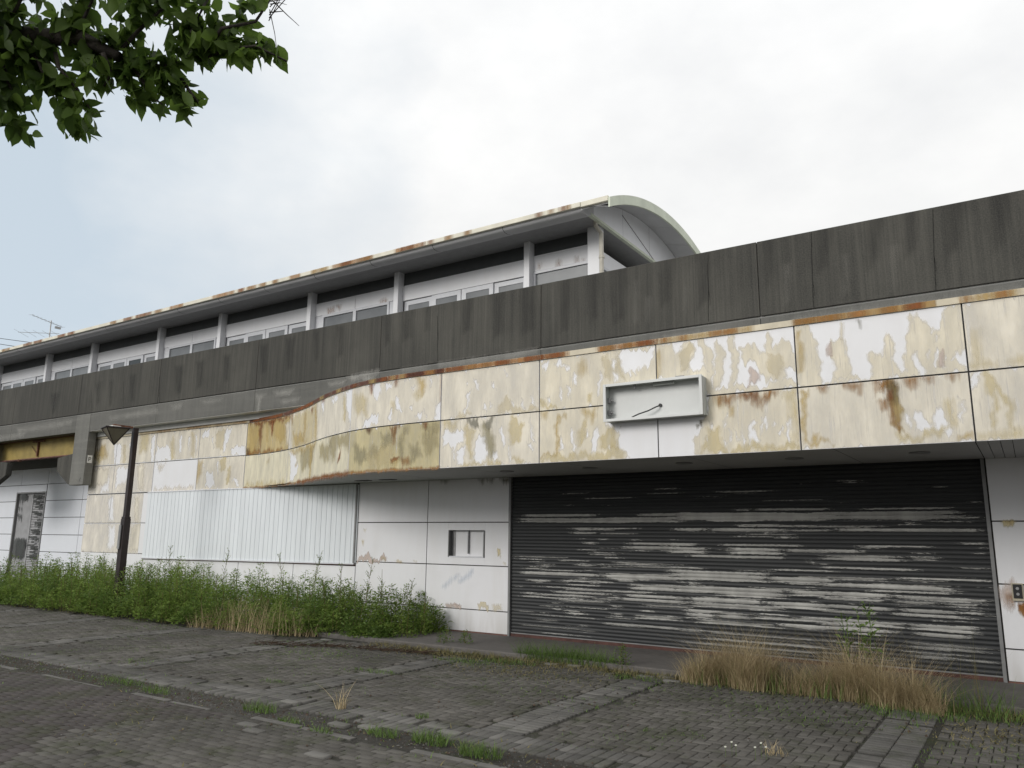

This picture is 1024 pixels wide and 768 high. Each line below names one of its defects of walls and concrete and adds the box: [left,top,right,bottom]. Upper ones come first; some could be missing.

corrosion [312,256,370,273]
corrosion [247,352,565,455]
corrosion [879,378,916,430]
corrosion [244,458,439,488]
peeling [514,490,999,663]